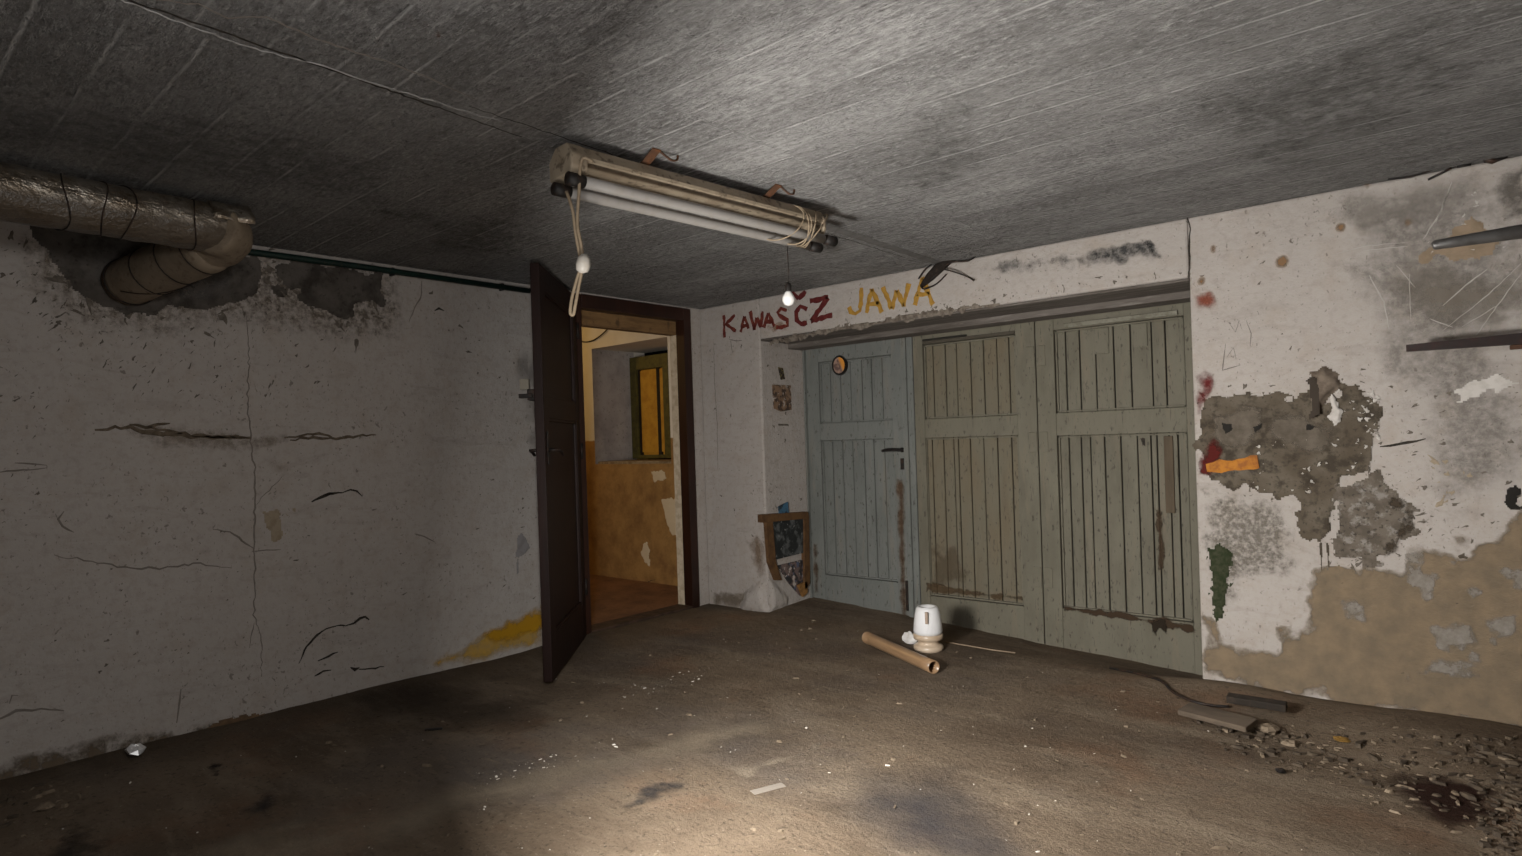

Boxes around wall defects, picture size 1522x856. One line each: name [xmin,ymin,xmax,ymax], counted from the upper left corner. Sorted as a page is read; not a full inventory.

flaking render [0,226,386,399]
crack [55,311,384,677]
damp [437,611,542,665]
flaking render [1192,358,1522,727]